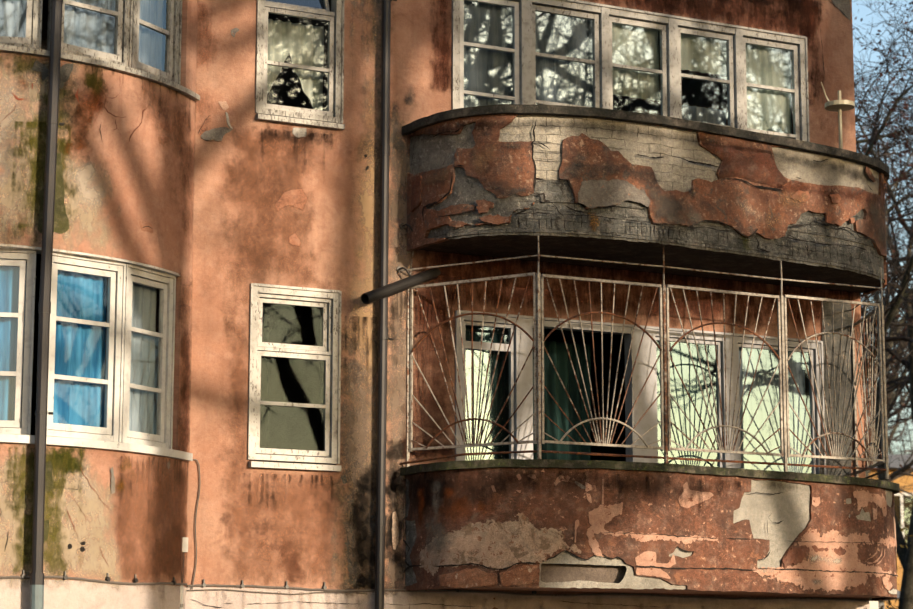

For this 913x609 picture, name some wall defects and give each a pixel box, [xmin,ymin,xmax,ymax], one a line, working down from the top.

water stain [432,0,451,91]
water stain [591,0,824,96]
peeling [828,0,851,20]
crack [95,83,150,141]
water stain [57,112,109,248]
spalling [393,115,884,283]
water stain [228,89,860,594]
spalling [819,301,854,477]
water stain [0,445,33,583]
water stain [43,457,187,582]
peeling [392,475,719,590]
peeling [733,480,898,594]